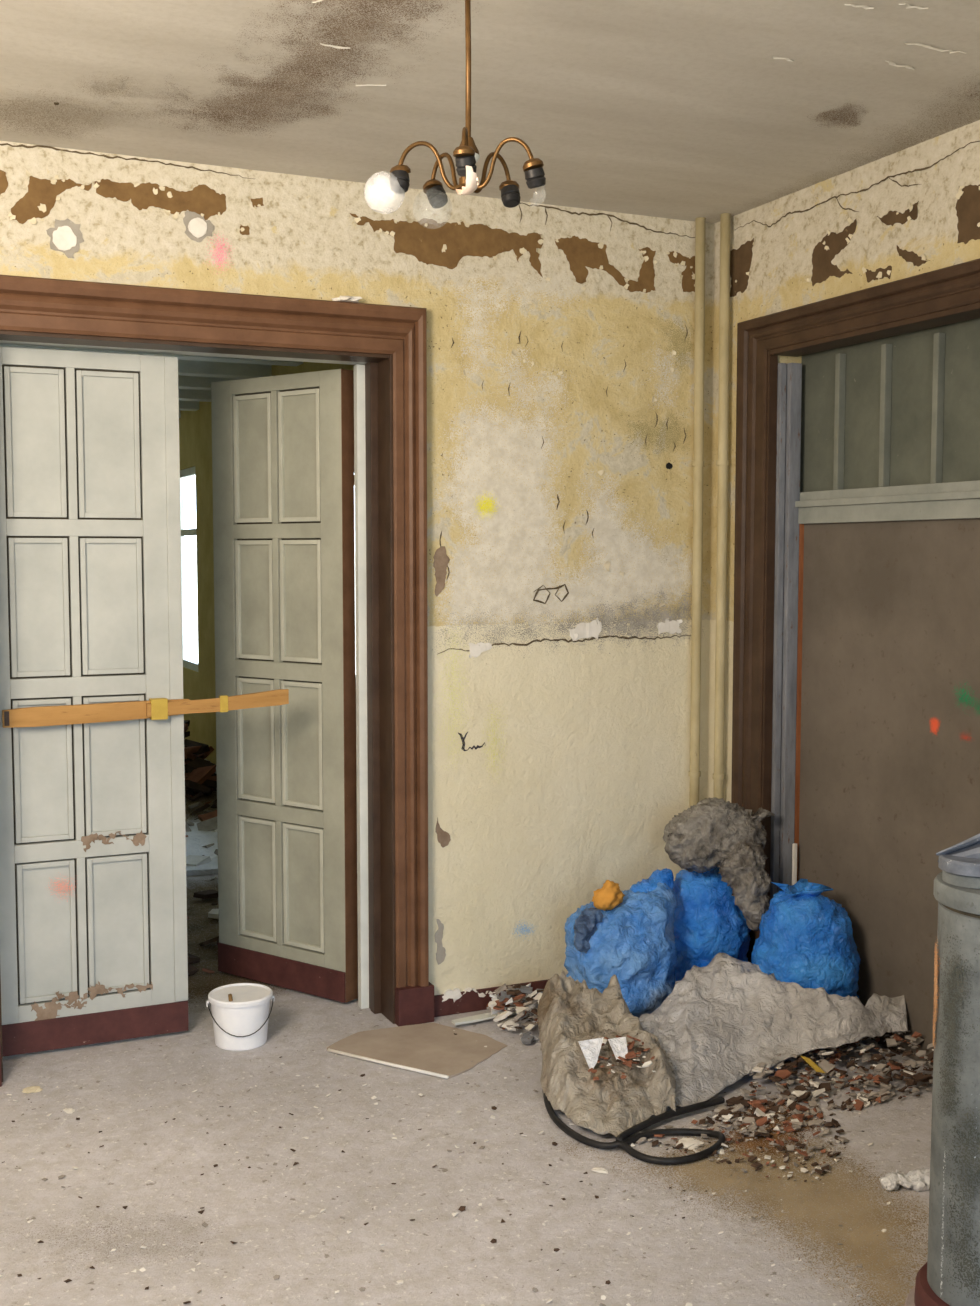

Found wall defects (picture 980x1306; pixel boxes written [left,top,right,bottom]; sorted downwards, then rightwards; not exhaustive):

damp [0,0,480,142]
peeling [0,170,226,225]
peeling [235,197,264,235]
crack [735,141,980,230]
peeling [877,201,919,226]
peeling [955,184,980,244]
peeling [350,213,695,293]
peeling [730,238,754,297]
peeling [807,217,930,286]
flaking render [427,332,707,658]
spalling [81,830,147,852]
spalling [31,981,153,1021]